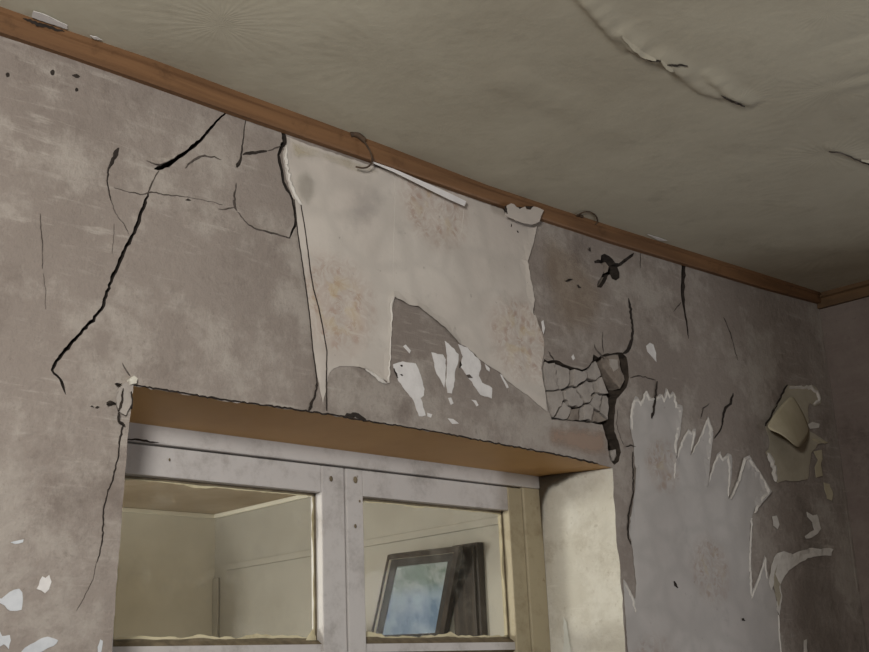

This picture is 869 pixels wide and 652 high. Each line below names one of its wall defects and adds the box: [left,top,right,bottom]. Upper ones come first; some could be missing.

crack [51,113,598,464]
peeling [393,345,432,418]
peeling [431,341,492,406]
peeling [765,385,828,483]
crack [76,426,124,611]
peeling [0,589,23,611]
peeling [37,575,51,593]
peeling [0,633,11,649]
peeling [22,637,58,652]